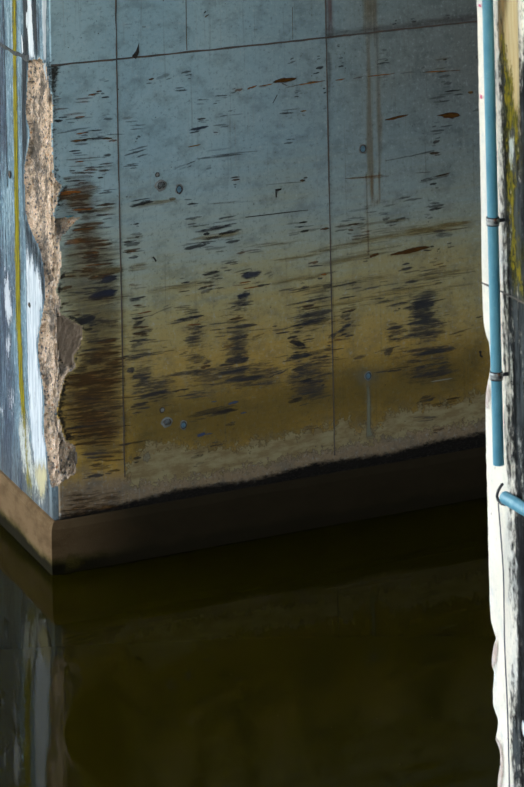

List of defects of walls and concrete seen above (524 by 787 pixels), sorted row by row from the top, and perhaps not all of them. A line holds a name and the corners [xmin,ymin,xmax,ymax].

spalling [24,57,82,488]
water stain [54,116,121,300]
water stain [185,216,241,250]
water stain [57,252,486,520]
corrosion [235,78,322,91]
water stain [320,213,466,243]
water stain [494,0,524,501]
water stain [509,508,524,787]